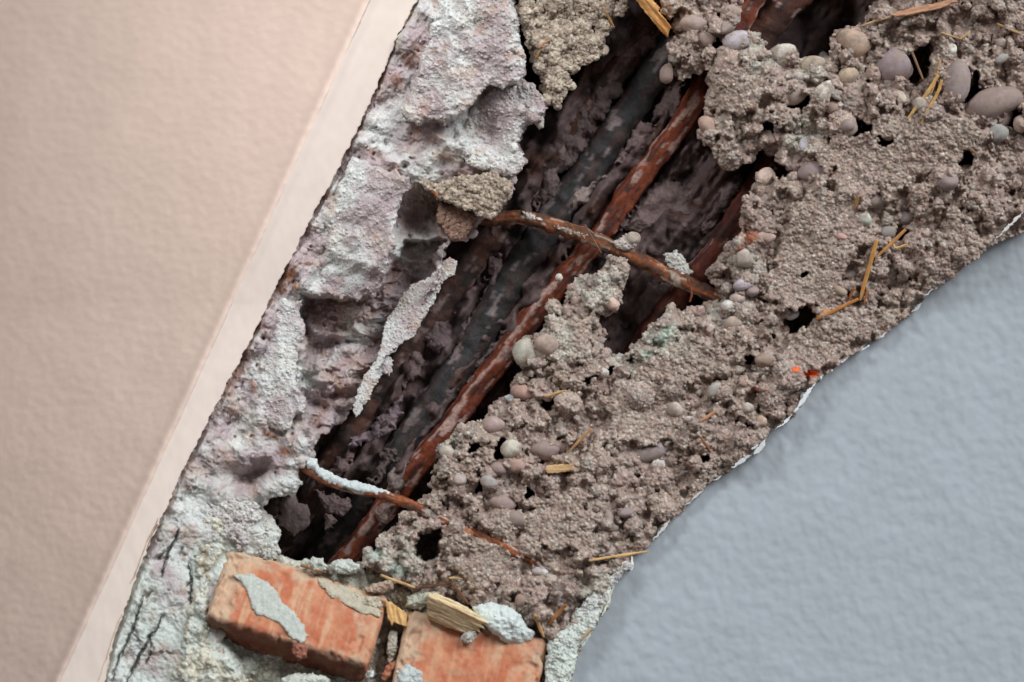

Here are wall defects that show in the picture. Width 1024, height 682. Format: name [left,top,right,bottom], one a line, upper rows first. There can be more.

crack [98,519,193,682]
spalling [105,0,629,682]
spalling [263,0,1024,682]